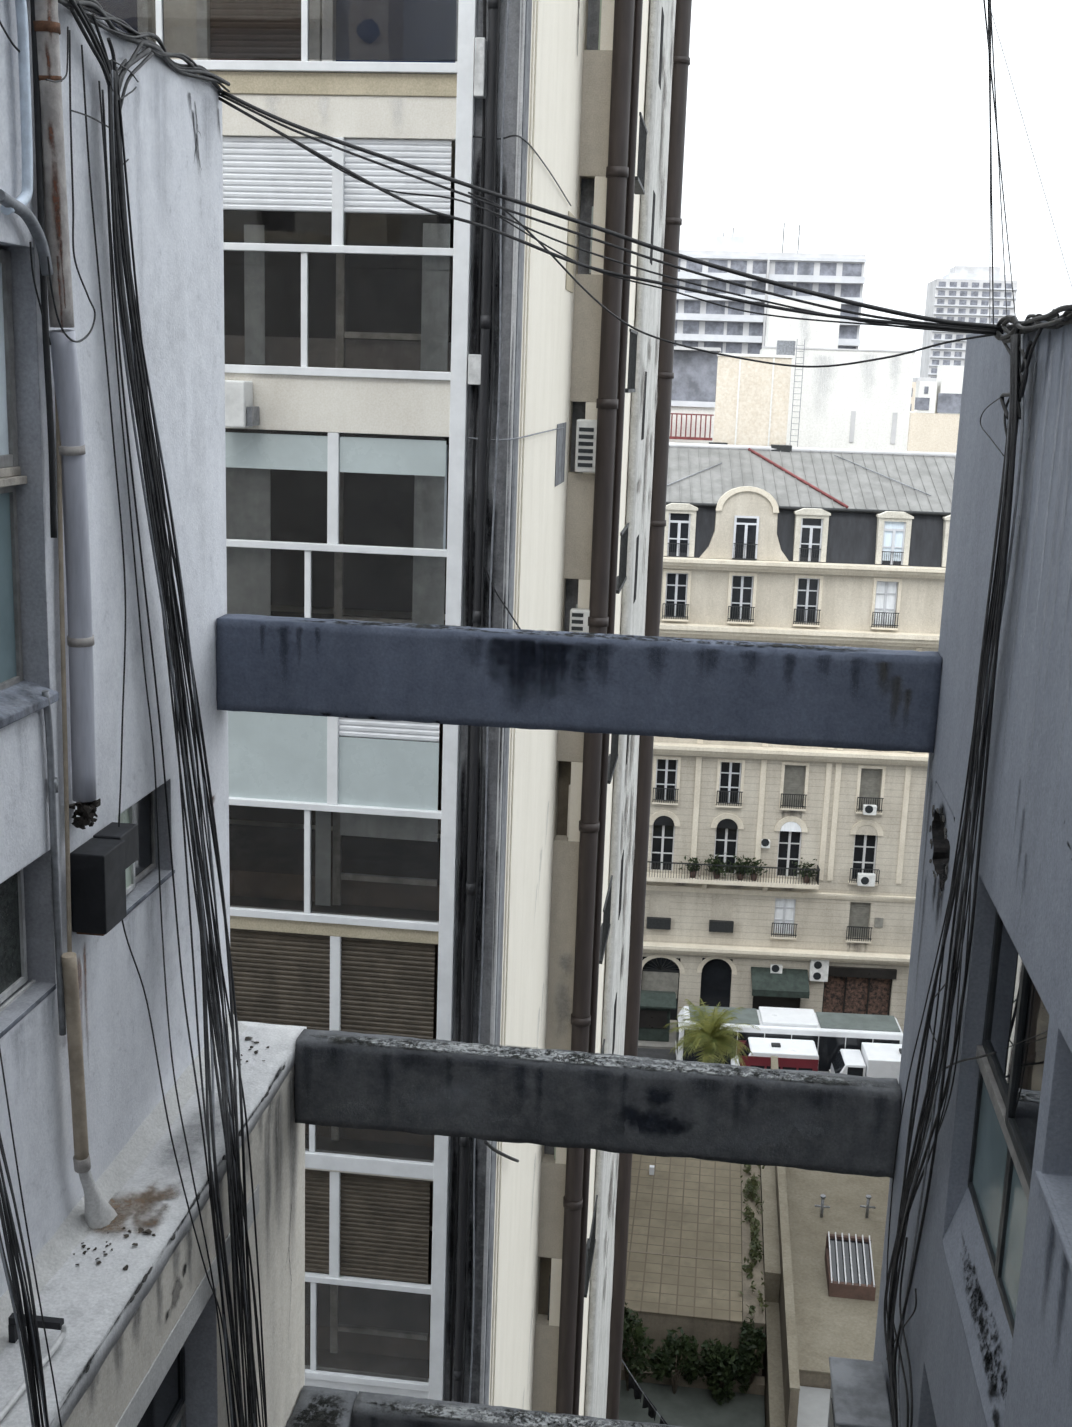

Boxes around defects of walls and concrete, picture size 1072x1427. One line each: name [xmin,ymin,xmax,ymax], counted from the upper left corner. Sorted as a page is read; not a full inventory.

corrosion [52,166,66,333]